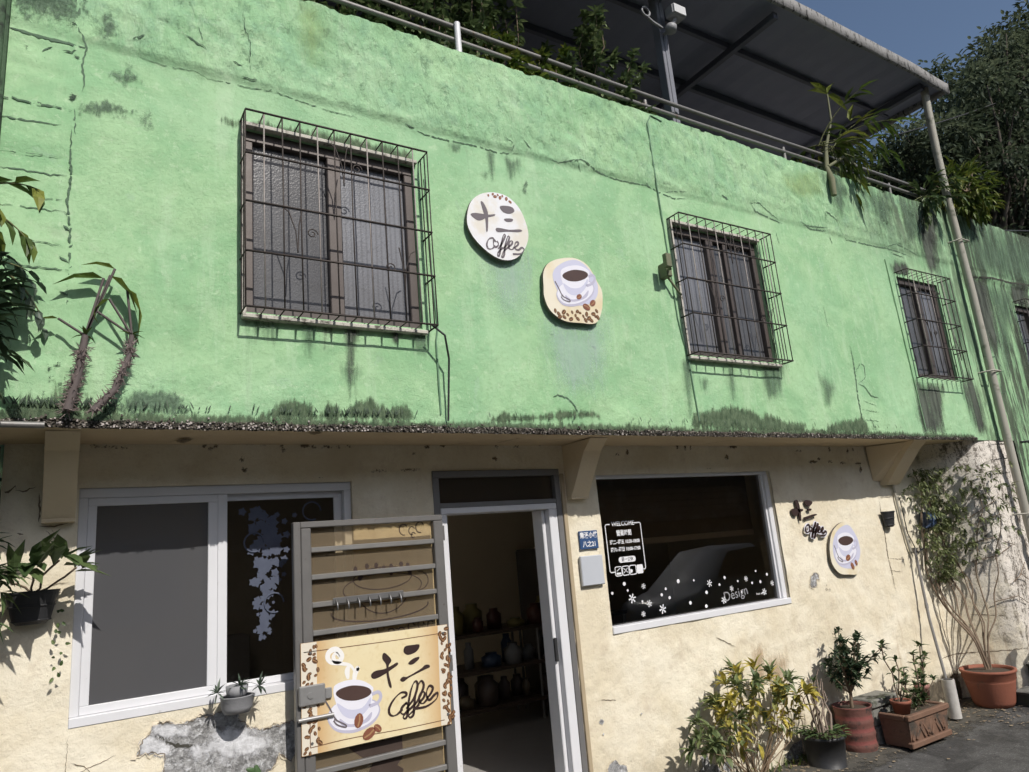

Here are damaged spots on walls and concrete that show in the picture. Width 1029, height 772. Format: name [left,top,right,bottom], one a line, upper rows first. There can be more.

crack [0,24,88,323]
crack [405,123,687,199]
water stain [901,203,939,272]
water stain [972,230,1029,384]
water stain [119,390,189,415]
water stain [764,367,783,396]
water stain [916,383,944,433]
water stain [960,369,986,434]
peeling [131,708,295,772]
peeling [607,759,628,772]